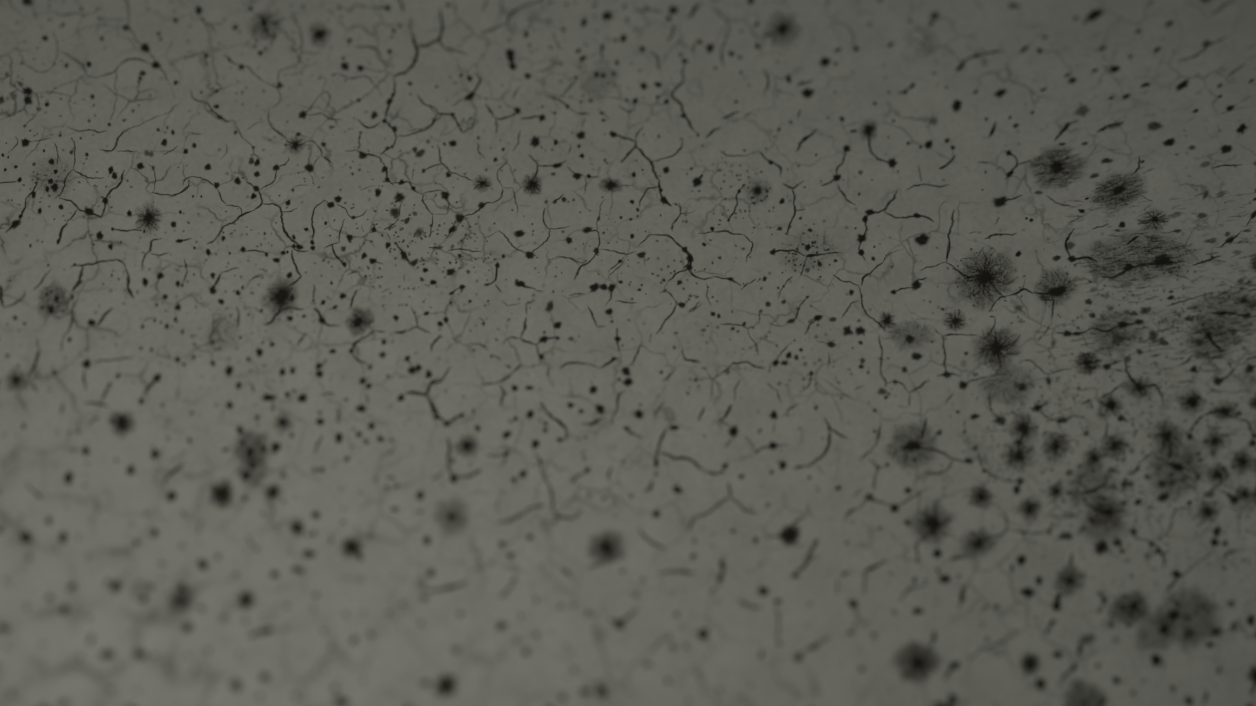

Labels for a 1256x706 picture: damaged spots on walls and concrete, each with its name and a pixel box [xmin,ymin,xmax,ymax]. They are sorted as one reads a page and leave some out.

water stain [1044,107,1106,175]
water stain [1079,158,1145,213]
water stain [1111,209,1180,271]
crack [1049,197,1251,278]
water stain [539,291,580,359]
water stain [891,280,959,324]
water stain [962,251,1021,299]
water stain [1044,280,1067,298]
crack [1171,289,1256,379]
water stain [876,437,920,470]
water stain [890,488,960,582]
crack [892,393,1256,610]